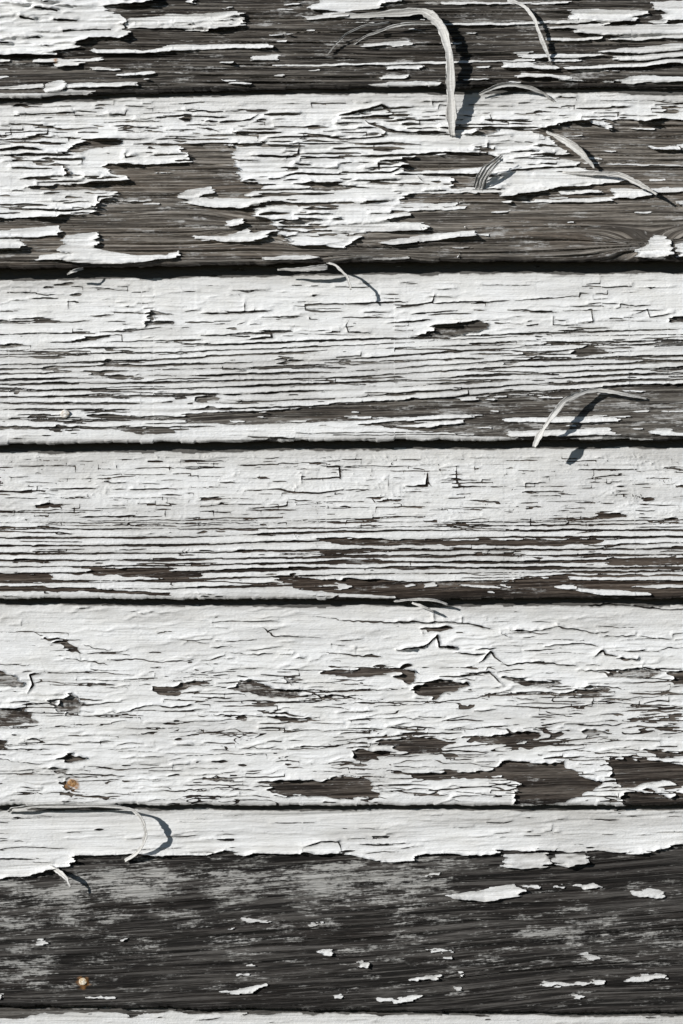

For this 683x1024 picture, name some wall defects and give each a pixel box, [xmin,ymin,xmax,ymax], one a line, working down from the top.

peeling [0,0,683,98]
peeling [0,119,683,268]
crack [0,295,683,421]
peeling [86,383,683,441]
crack [0,464,683,591]
peeling [274,556,683,600]
crack [66,603,683,749]
peeling [320,663,470,700]
crack [164,783,252,792]
peeling [258,776,380,800]
peeling [411,749,683,806]
peeling [0,844,683,1019]